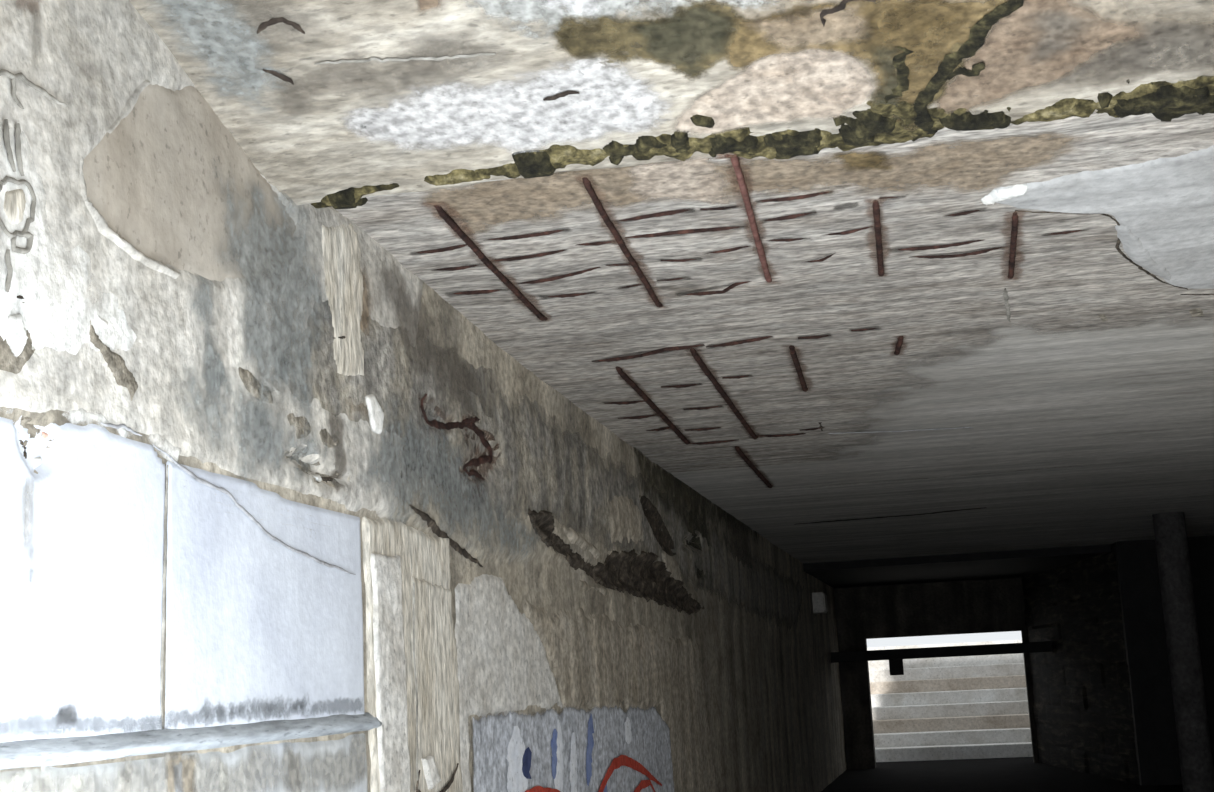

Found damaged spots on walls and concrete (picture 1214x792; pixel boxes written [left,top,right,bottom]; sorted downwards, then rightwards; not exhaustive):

leakage [281,0,843,151]
leakage [675,50,874,133]
crack [820,0,876,26]
crack [884,0,1024,142]
peeling [80,80,296,282]
leakage [424,133,1074,234]
peeling [981,145,1214,289]
crack [101,422,356,720]
spalling [528,495,705,615]